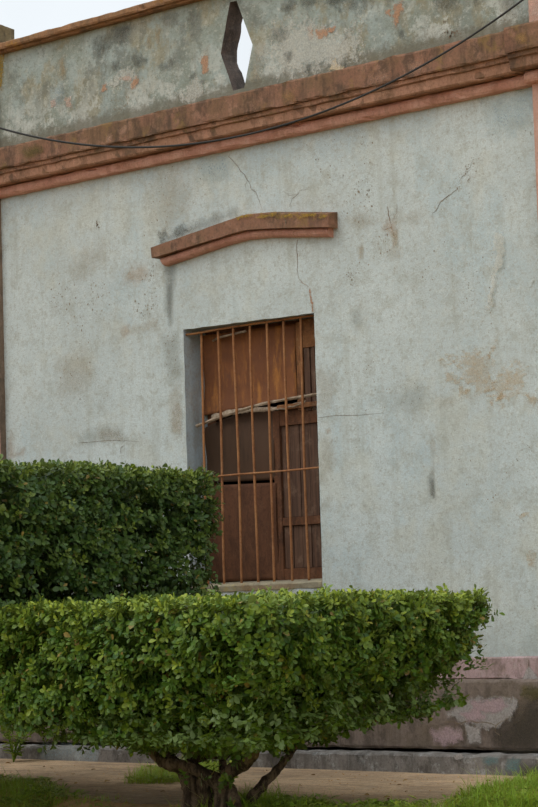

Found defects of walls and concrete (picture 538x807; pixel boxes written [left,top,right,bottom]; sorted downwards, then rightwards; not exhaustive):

crack [283,189,313,309]
rust [203,324,297,415]